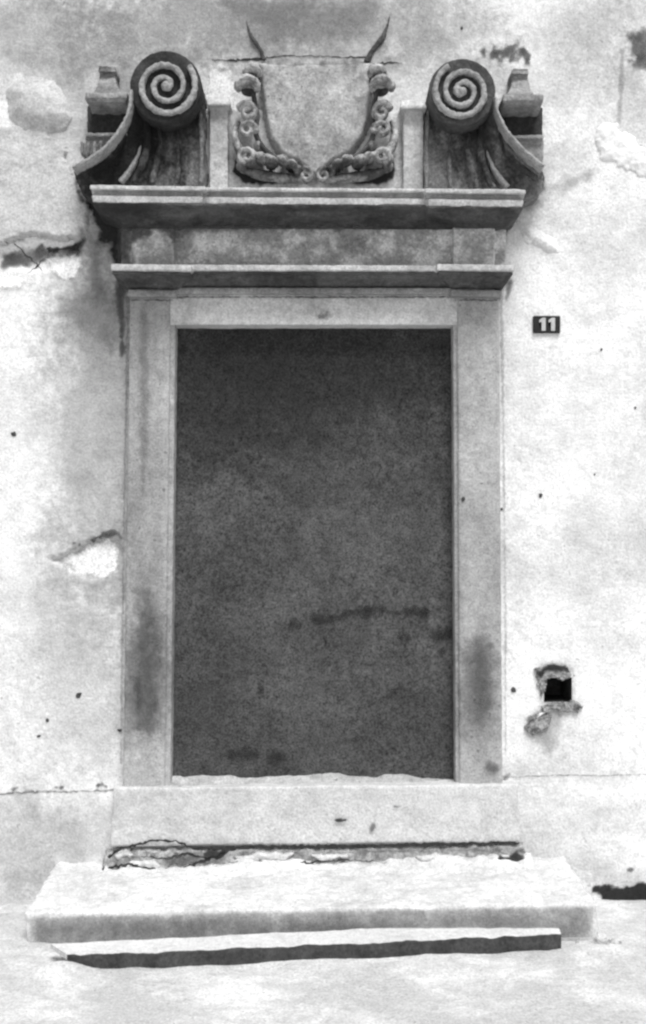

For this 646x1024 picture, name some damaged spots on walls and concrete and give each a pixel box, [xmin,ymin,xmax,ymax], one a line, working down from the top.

flaking render [595,123,646,177]
flaking render [0,125,91,288]
flaking render [63,529,122,578]
flaking render [524,664,583,735]
peeling [114,848,161,869]
peeling [233,850,294,861]
peeling [310,853,348,861]